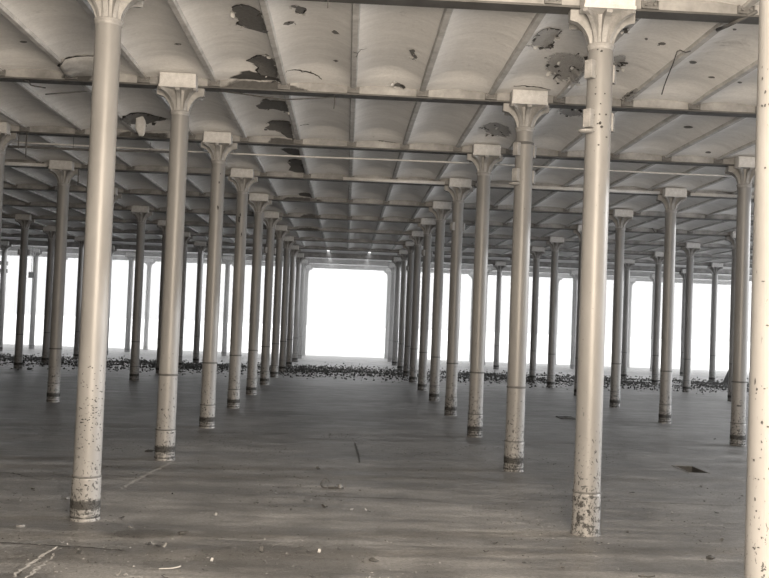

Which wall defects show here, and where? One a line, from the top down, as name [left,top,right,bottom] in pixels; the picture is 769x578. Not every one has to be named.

peeling [230,4,268,34]
peeling [283,5,307,25]
peeling [246,54,278,78]
peeling [526,28,588,89]
flaking render [120,112,167,136]
peeling [256,99,305,174]
peeling [480,123,511,137]